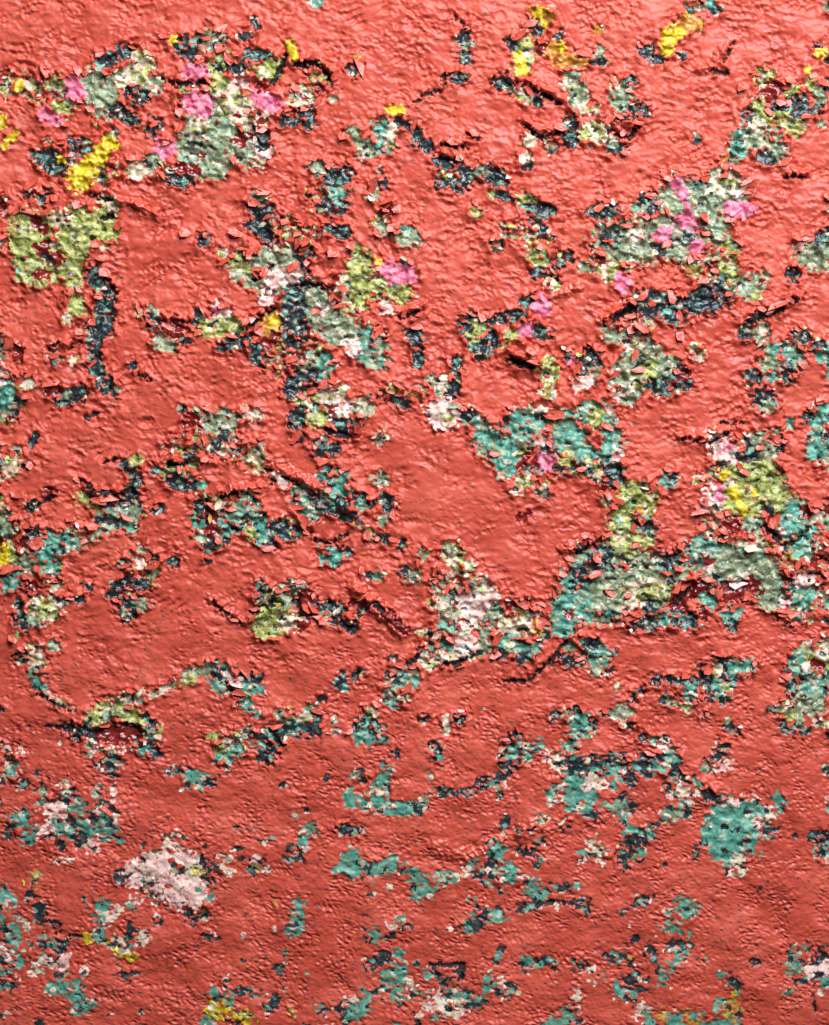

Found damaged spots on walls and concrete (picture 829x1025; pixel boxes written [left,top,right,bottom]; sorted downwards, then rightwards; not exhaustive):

peeling [306,0,324,9]
peeling [692,0,724,16]
peeling [0,3,829,792]
peeling [0,656,268,866]
peeling [342,651,789,878]
peeling [281,807,320,863]
peeling [791,829,829,864]
peeling [0,827,275,1017]
peeling [198,892,744,1025]
peeling [780,938,829,1012]